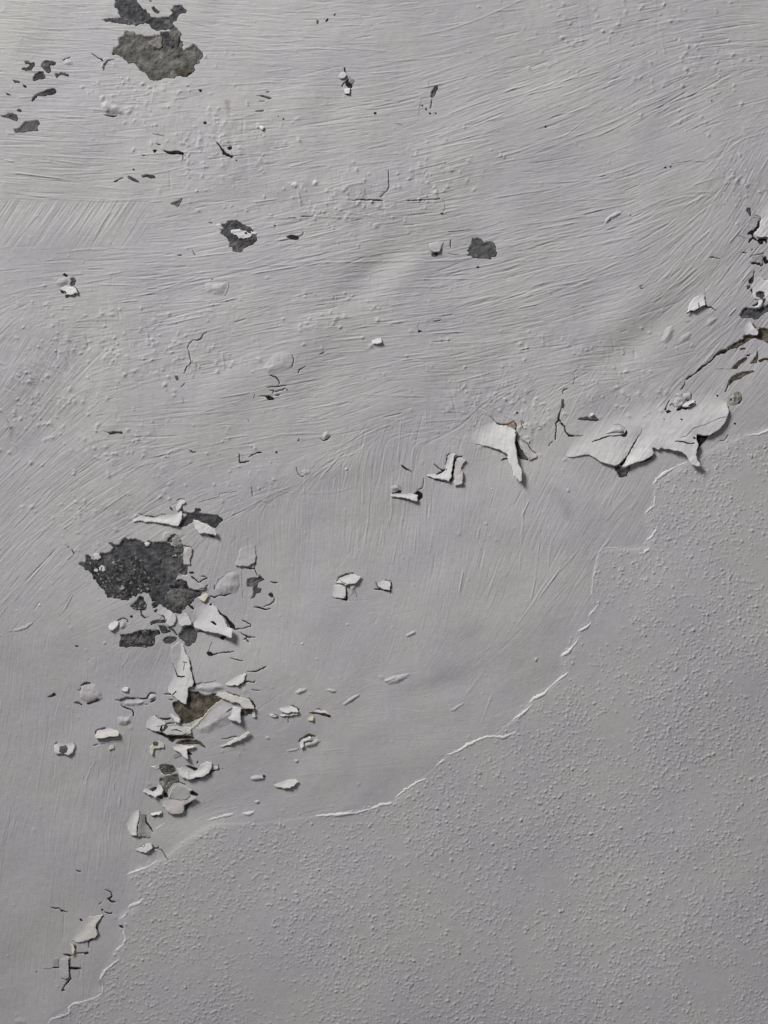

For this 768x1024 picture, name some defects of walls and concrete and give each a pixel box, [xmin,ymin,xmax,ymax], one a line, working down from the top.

spalling [102,0,203,81]
spalling [6,60,69,101]
spalling [1,109,40,133]
spalling [210,220,257,252]
peeling [754,196,768,238]
peeling [686,292,716,322]
peeling [739,253,768,336]
peeling [390,453,466,502]
peeling [470,412,537,482]
peeling [566,392,742,477]
spalling [79,499,265,860]
peeling [52,890,115,991]